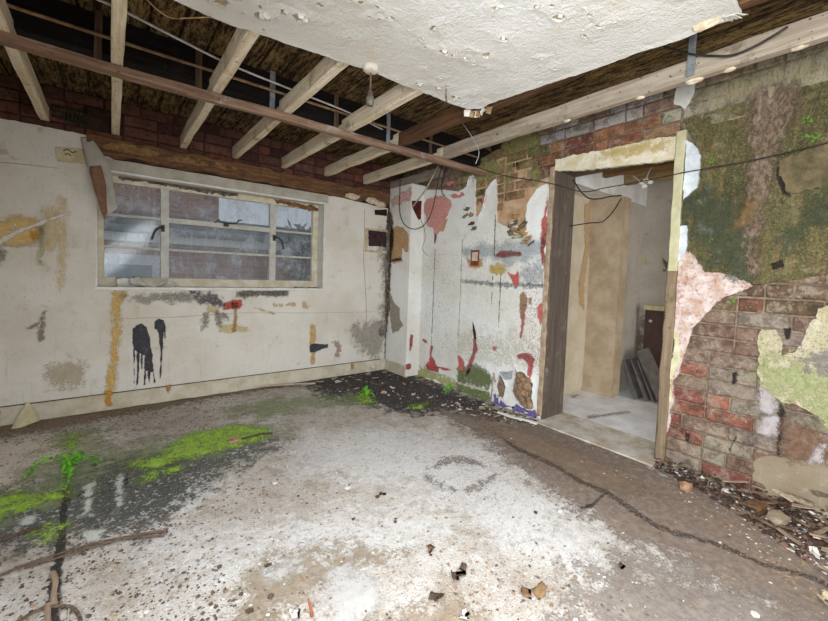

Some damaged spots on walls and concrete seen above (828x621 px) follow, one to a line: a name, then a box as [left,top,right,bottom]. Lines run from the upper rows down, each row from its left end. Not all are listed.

peeling [281,9,309,23]
peeling [102,142,238,170]
peeling [374,189,412,216]
spalling [390,226,409,262]
peeling [406,41,828,419]
damp [695,45,828,276]
rust [104,290,127,406]
spalling [389,296,403,333]
flaking render [665,251,828,493]
damp [0,431,288,561]
crack [494,432,828,588]